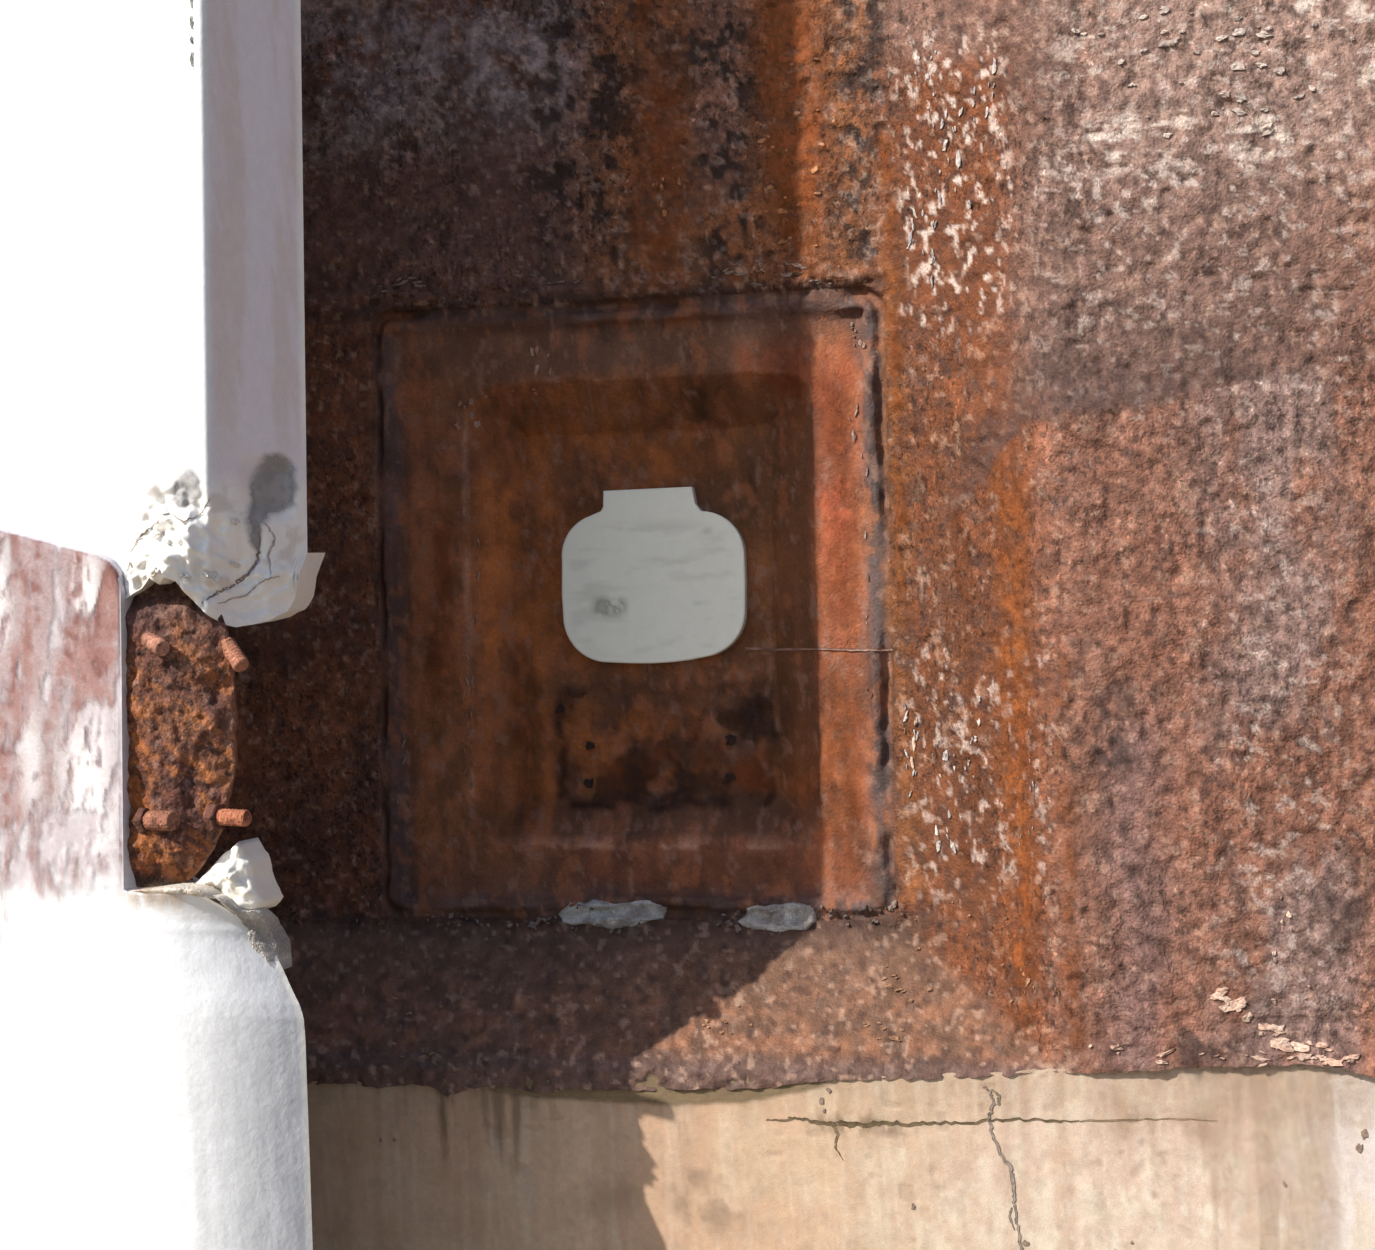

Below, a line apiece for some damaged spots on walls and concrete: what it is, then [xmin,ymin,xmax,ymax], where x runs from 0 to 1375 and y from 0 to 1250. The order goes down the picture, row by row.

spalling [180,455,296,604]
corrosion [560,694,777,811]
crack [766,1086,1217,1250]